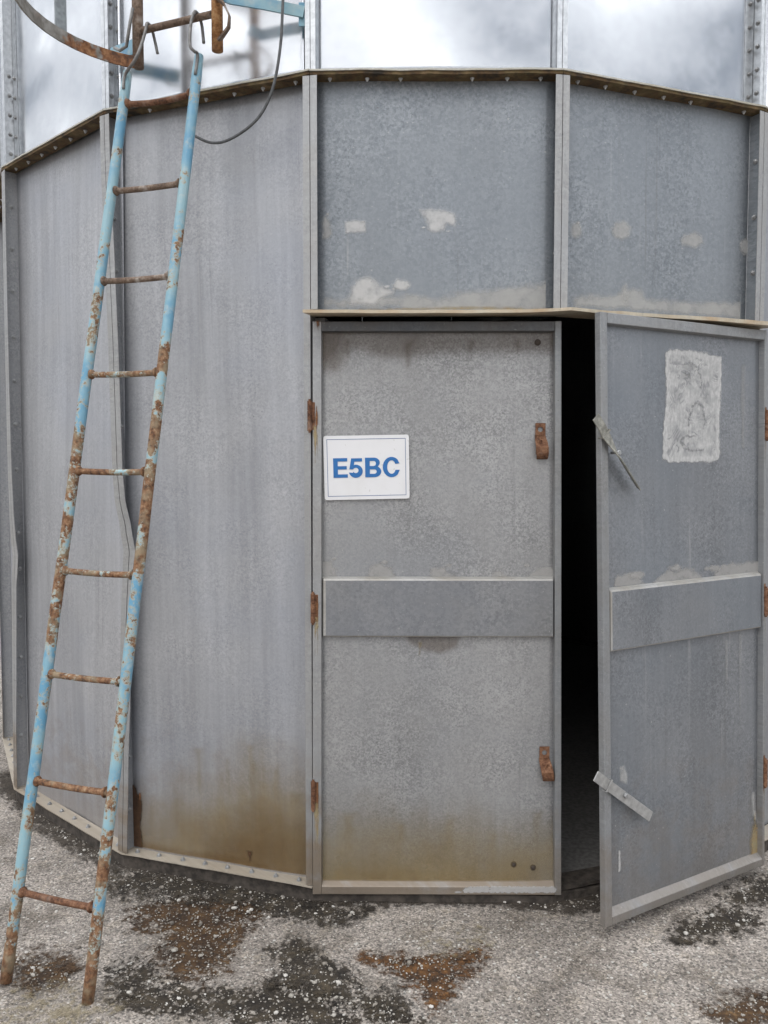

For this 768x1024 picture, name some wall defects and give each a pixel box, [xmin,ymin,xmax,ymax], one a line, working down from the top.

peeling [346,221,365,233]
peeling [422,210,455,232]
peeling [351,278,409,303]
corrosion [132,785,142,848]
leakage [0,772,600,928]